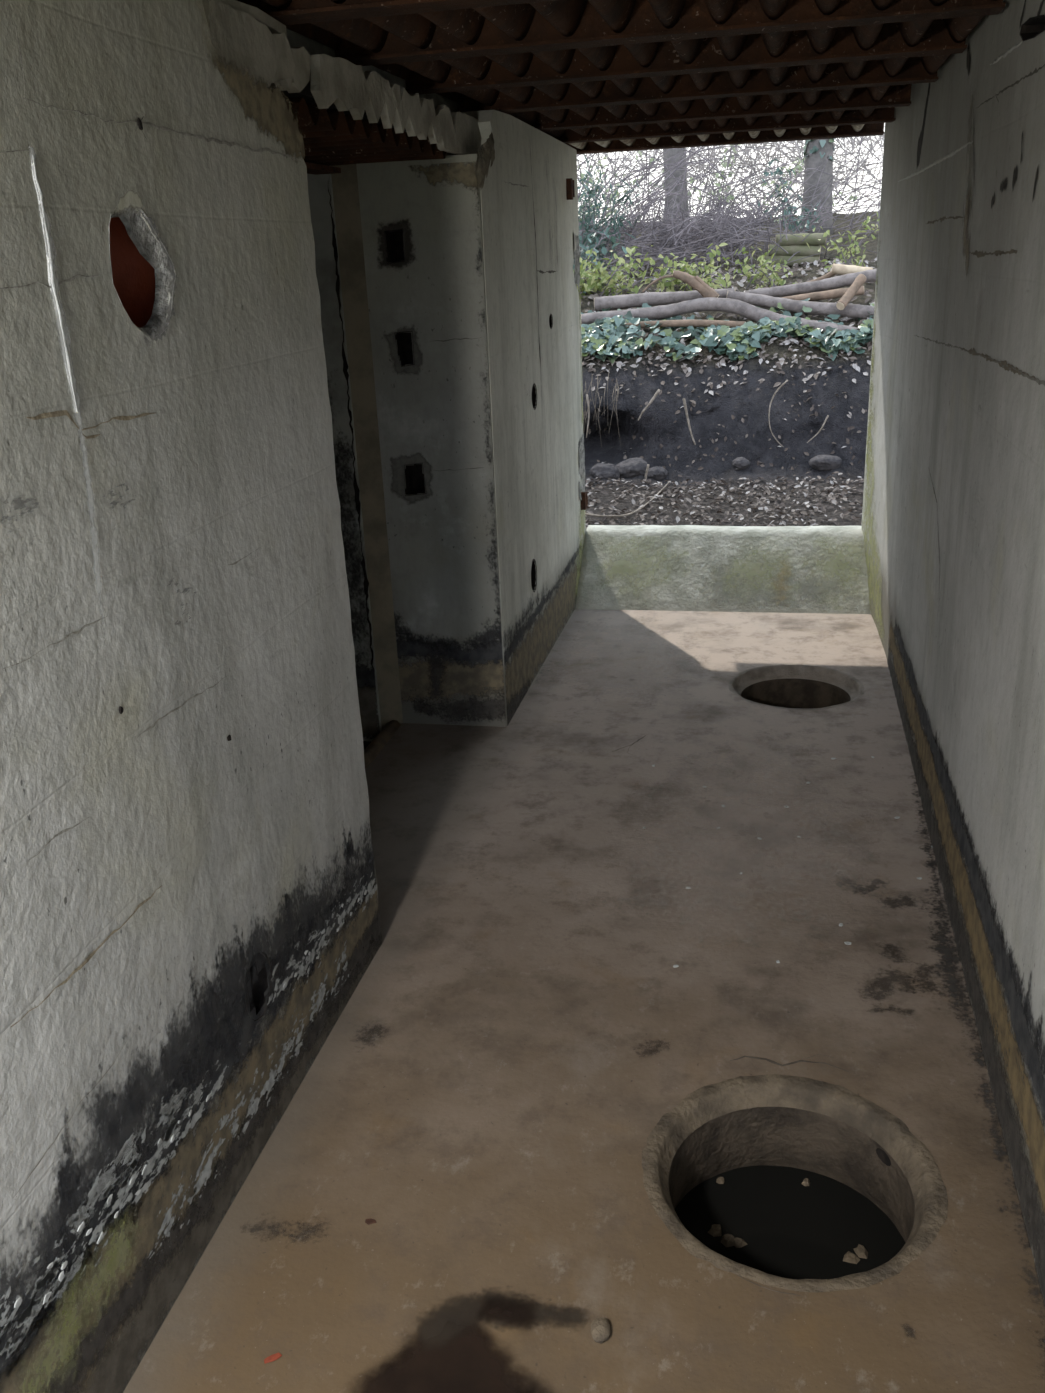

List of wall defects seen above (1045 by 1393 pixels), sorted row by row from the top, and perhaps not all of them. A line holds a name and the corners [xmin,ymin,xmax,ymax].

spalling [213,57,305,163]
spalling [410,131,495,196]
crack [927,64,1045,224]
crack [0,272,105,289]
spalling [108,190,178,344]
crack [970,249,1017,258]
crack [914,335,1045,386]
leakage [394,487,585,726]
leakage [843,622,1045,1304]
leakage [0,824,382,1393]